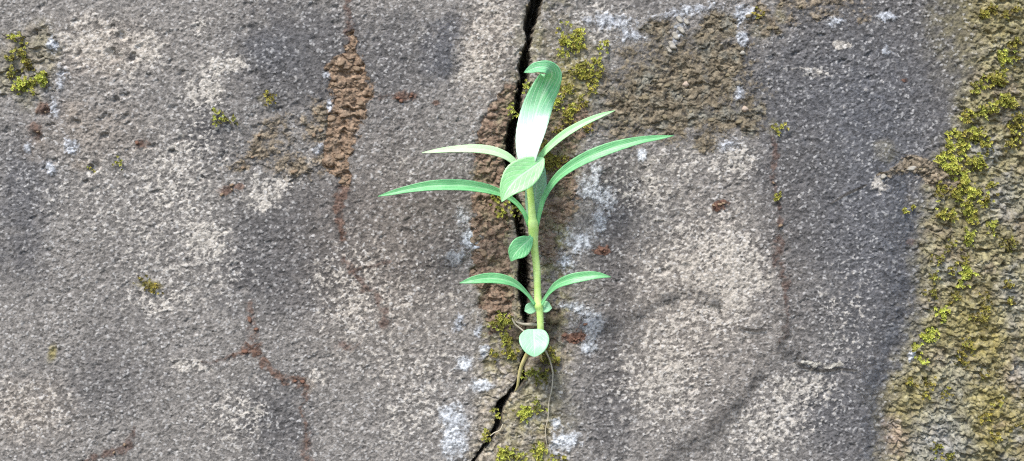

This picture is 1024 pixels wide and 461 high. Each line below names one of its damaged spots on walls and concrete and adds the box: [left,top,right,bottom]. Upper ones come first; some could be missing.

crack [503,0,543,171]
rust [216,309,309,388]
rust [342,257,389,329]
crack [471,193,534,461]